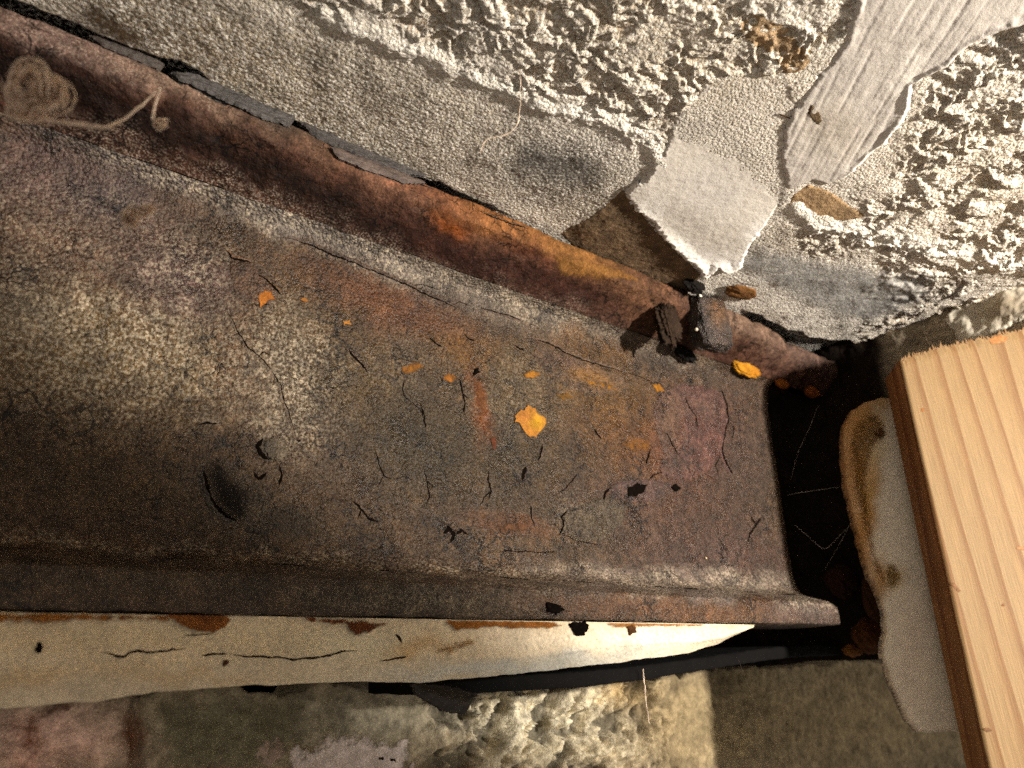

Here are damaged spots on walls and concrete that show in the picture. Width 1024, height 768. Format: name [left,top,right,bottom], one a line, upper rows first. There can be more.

spalling [737,14,812,74]
corrosion [89,35,426,185]
spalling [808,105,822,125]
peeling [561,111,864,292]
crack [280,234,655,385]
corrosion [652,302,697,364]
peeling [943,287,1024,343]
crack [215,311,301,442]
corrosion [515,405,546,437]
crack [501,444,599,553]
corrosion [0,613,231,633]
crack [104,634,358,661]